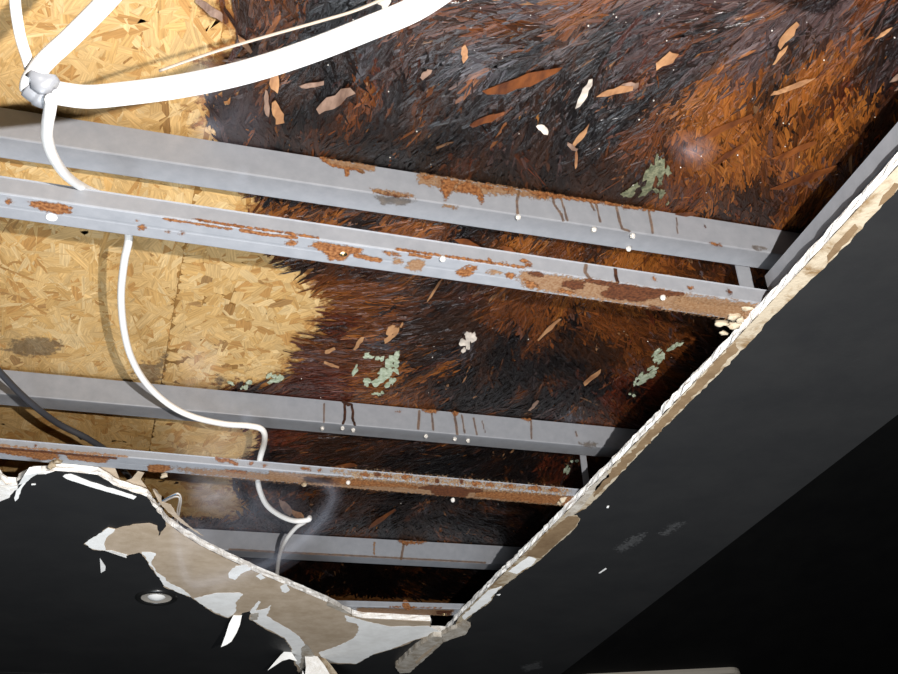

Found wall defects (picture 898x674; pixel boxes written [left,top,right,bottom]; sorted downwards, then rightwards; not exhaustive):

water stain [185,0,898,233]
corrosion [320,156,375,177]
corrosion [29,201,72,214]
corrosion [416,173,655,233]
corrosion [163,218,758,320]
water stain [238,192,739,286]
water stain [205,254,734,430]
corrosion [0,444,128,463]
corrosion [147,456,573,506]
water stain [241,428,611,489]
water stain [170,478,564,547]
water stain [240,557,499,604]